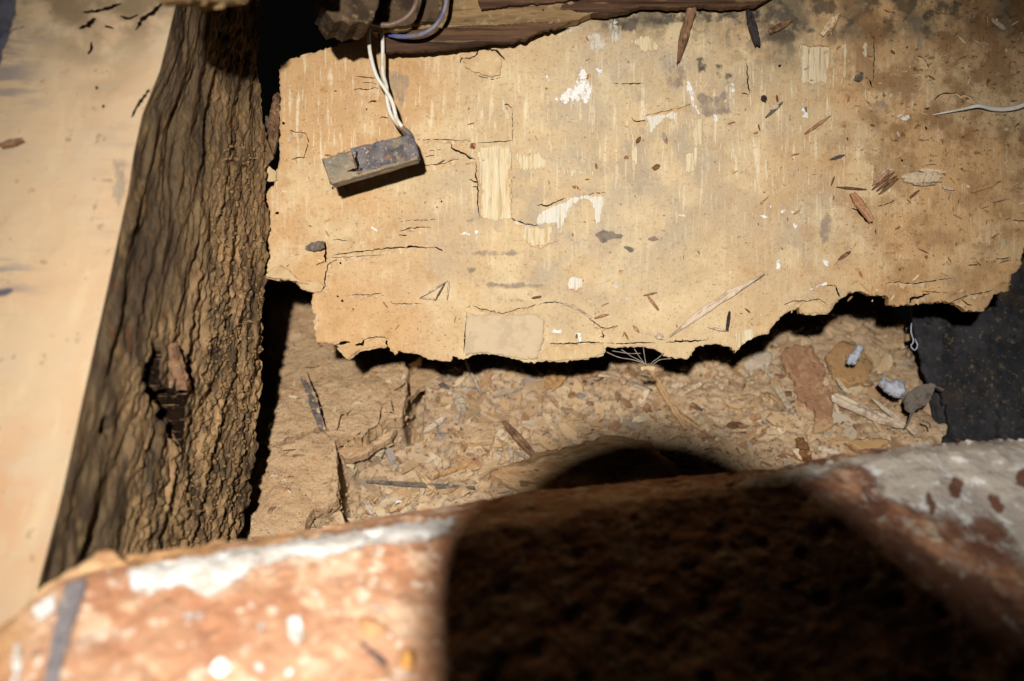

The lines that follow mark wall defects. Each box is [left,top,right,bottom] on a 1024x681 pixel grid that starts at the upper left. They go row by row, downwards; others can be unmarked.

peeling [800,43,847,85]
crack [417,103,513,216]
peeling [477,145,605,249]
peeling [264,265,324,293]
crack [315,219,442,309]
crack [464,301,559,347]
peeling [465,312,604,361]
peeling [568,277,582,292]
peeling [735,329,754,348]
peeling [798,301,833,314]